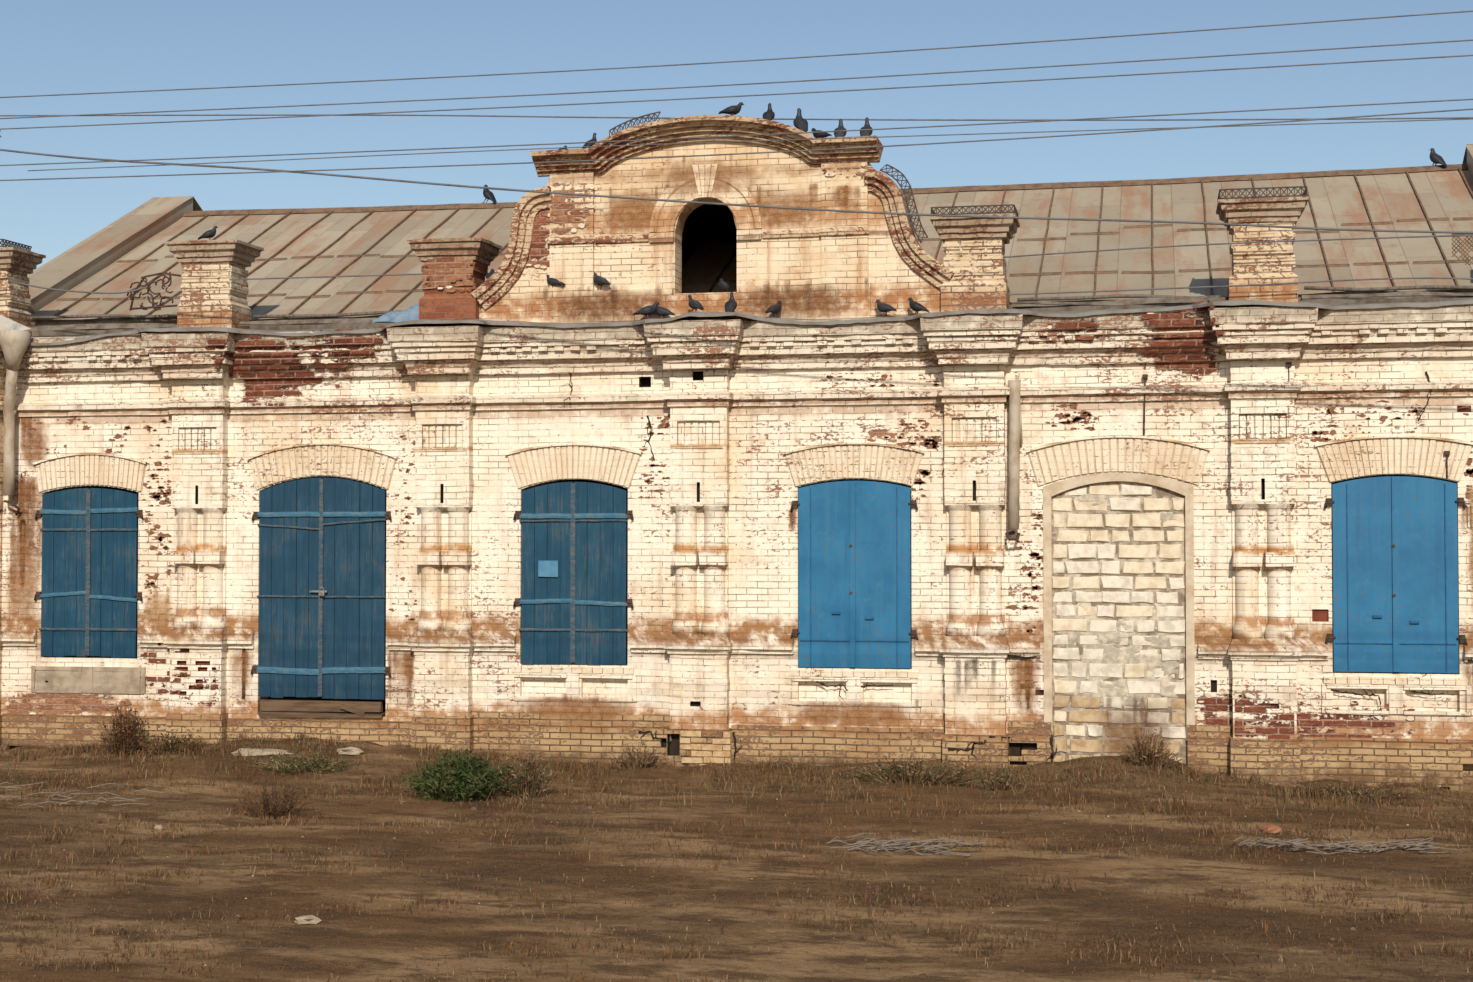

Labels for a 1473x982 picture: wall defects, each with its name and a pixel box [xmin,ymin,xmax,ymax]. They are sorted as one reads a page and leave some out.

peeling [526,182,595,269]
peeling [204,326,392,406]
peeling [1047,317,1100,341]
peeling [1136,299,1226,379]
peeling [31,416,174,622]
water stain [9,526,41,613]
peeling [5,643,222,716]
peeling [1196,690,1415,739]